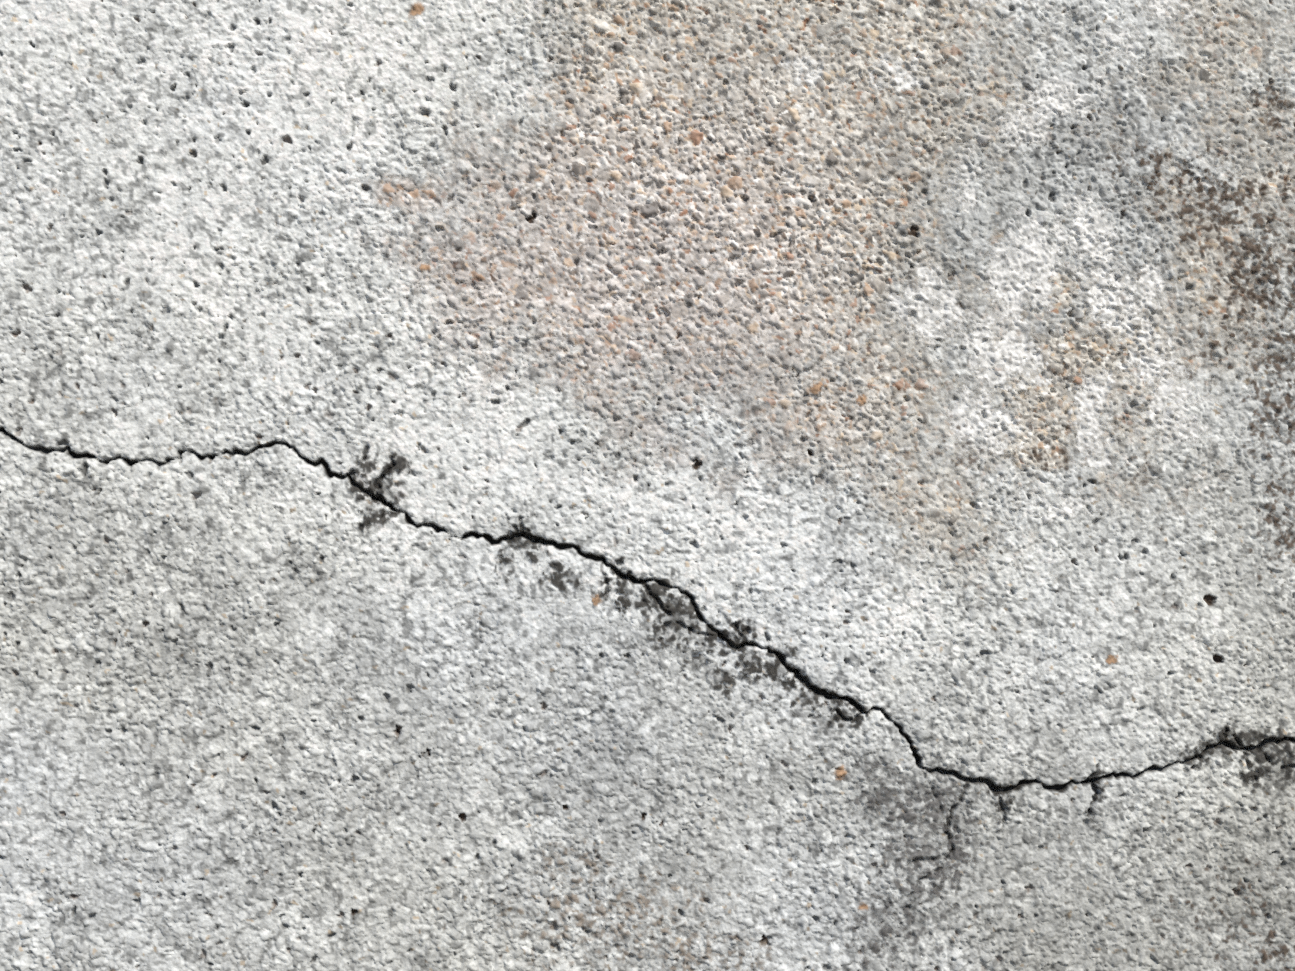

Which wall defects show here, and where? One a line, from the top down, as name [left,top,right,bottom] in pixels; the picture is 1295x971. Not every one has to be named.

crack [0,428,1295,894]